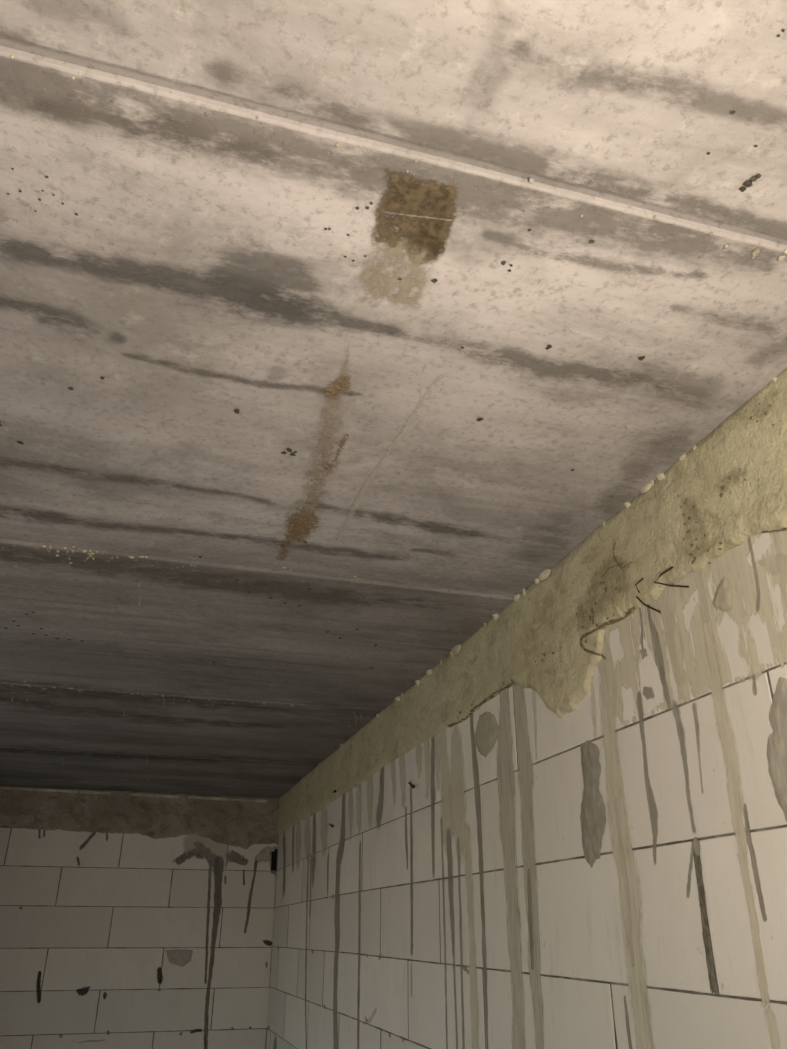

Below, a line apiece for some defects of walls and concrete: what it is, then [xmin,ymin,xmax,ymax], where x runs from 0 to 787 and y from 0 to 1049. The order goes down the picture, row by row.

leakage [0,240,400,335]
leakage [0,507,400,560]
leakage [188,370,361,395]
rust [279,360,350,560]
leakage [0,55,787,268]
rust [362,169,457,305]
leakage [351,510,481,536]
leakage [480,351,657,387]
leakage [173,842,258,1049]
leakage [283,713,488,1049]
leakage [497,684,544,1049]
leakage [598,528,787,1049]